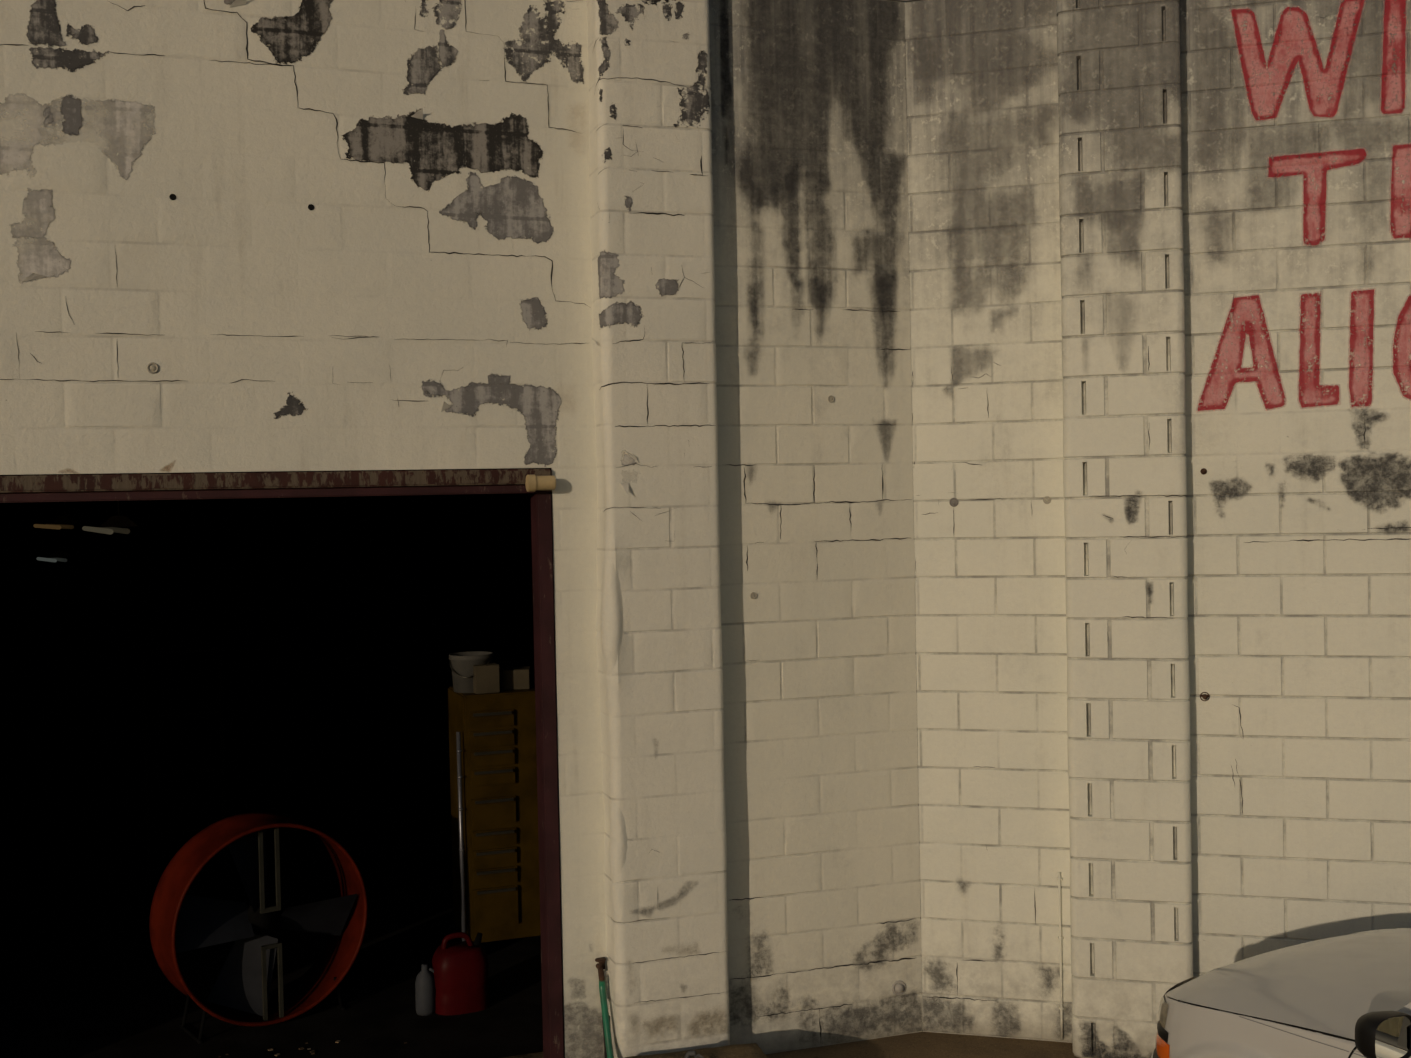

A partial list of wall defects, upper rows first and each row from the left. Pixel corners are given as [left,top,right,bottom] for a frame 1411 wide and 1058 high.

peeling [26,0,109,72]
peeling [251,0,334,64]
peeling [342,0,554,244]
peeling [503,0,689,119]
peeling [673,51,710,128]
water stain [720,0,732,115]
water stain [741,0,904,372]
water stain [950,126,1026,304]
water stain [953,348,963,384]
peeling [421,374,562,467]
water stain [857,927,906,967]
water stain [828,967,971,1035]